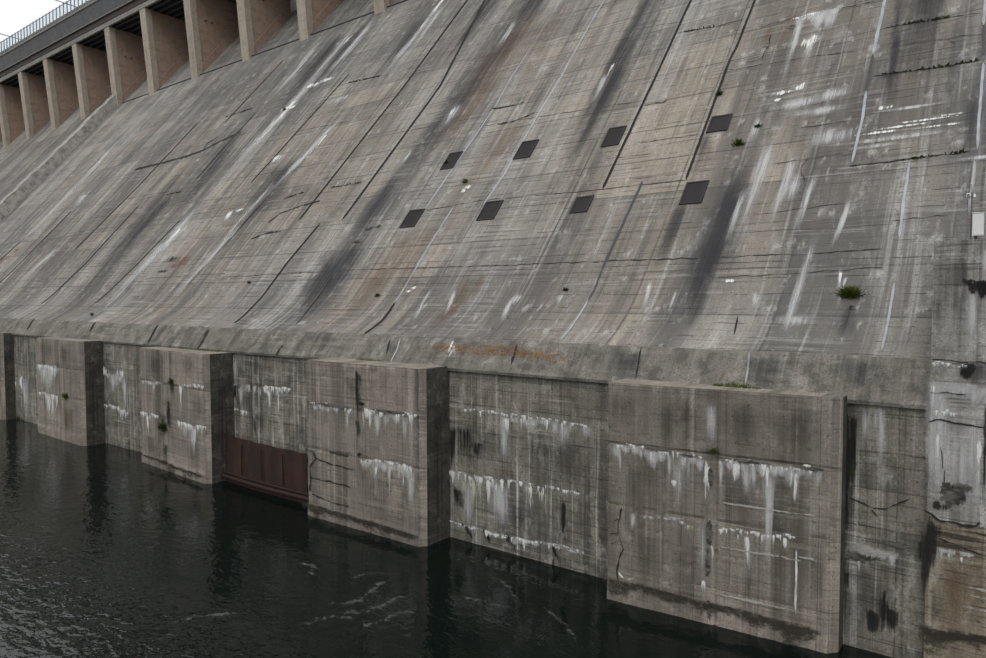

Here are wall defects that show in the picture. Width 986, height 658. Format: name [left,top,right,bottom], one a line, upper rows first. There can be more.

leakage [38,364,58,411]
leakage [103,366,128,417]
leakage [140,384,206,447]
leakage [234,360,291,435]
leakage [464,409,590,451]
leakage [930,361,986,484]
crack [308,450,352,507]
leakage [361,459,413,494]
leakage [449,429,584,565]
crack [611,508,631,580]
leakage [603,444,821,647]